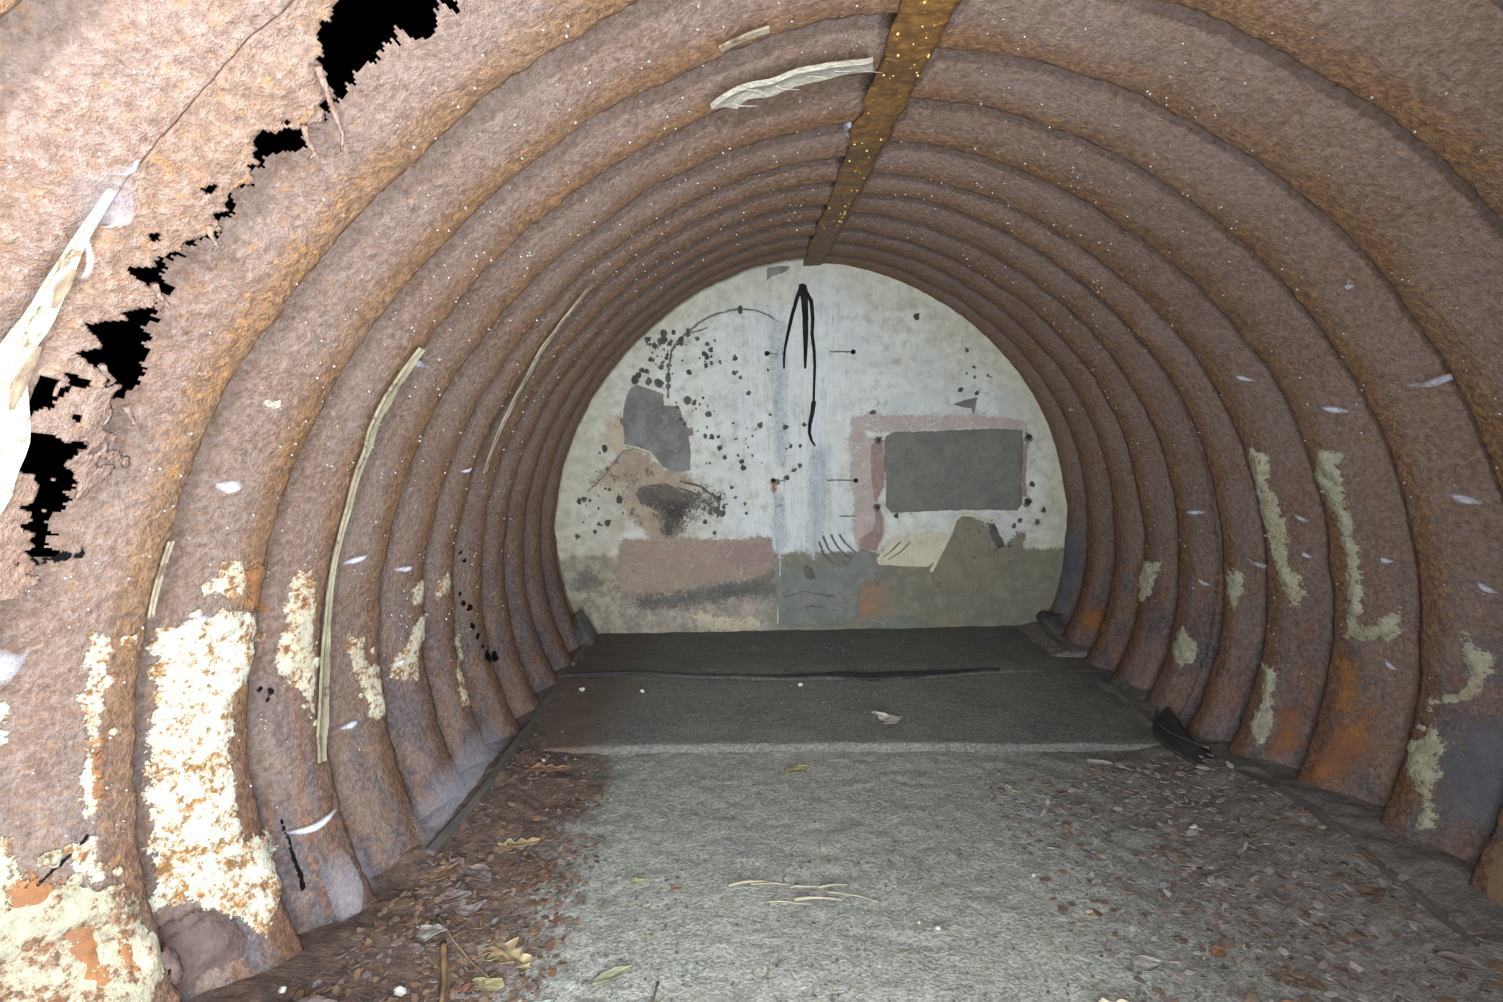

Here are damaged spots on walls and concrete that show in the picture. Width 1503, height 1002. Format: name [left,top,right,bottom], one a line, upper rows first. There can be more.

peeling [300,123,317,161]
peeling [313,64,345,152]
peeling [204,224,220,253]
peeling [150,282,171,312]
peeling [0,188,117,514]
peeling [0,347,451,1002]